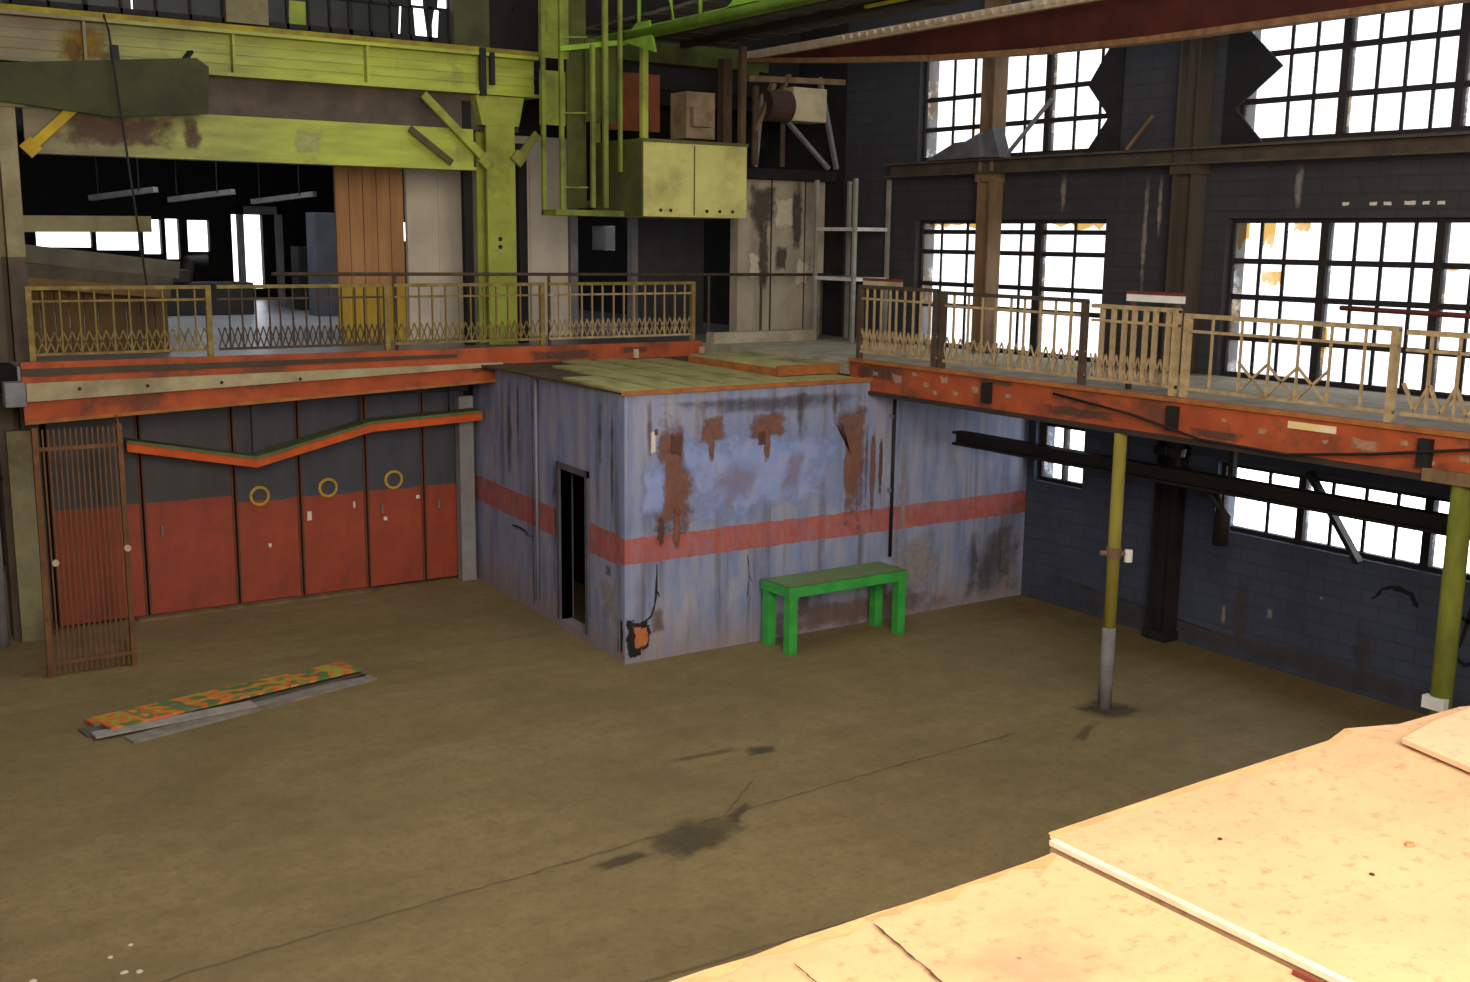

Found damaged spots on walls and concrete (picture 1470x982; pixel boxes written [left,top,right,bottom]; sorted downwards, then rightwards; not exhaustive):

rust [656,428,693,546]
rust [702,417,723,460]
rust [752,412,784,458]
rust [837,408,883,520]
damp [598,805,748,868]